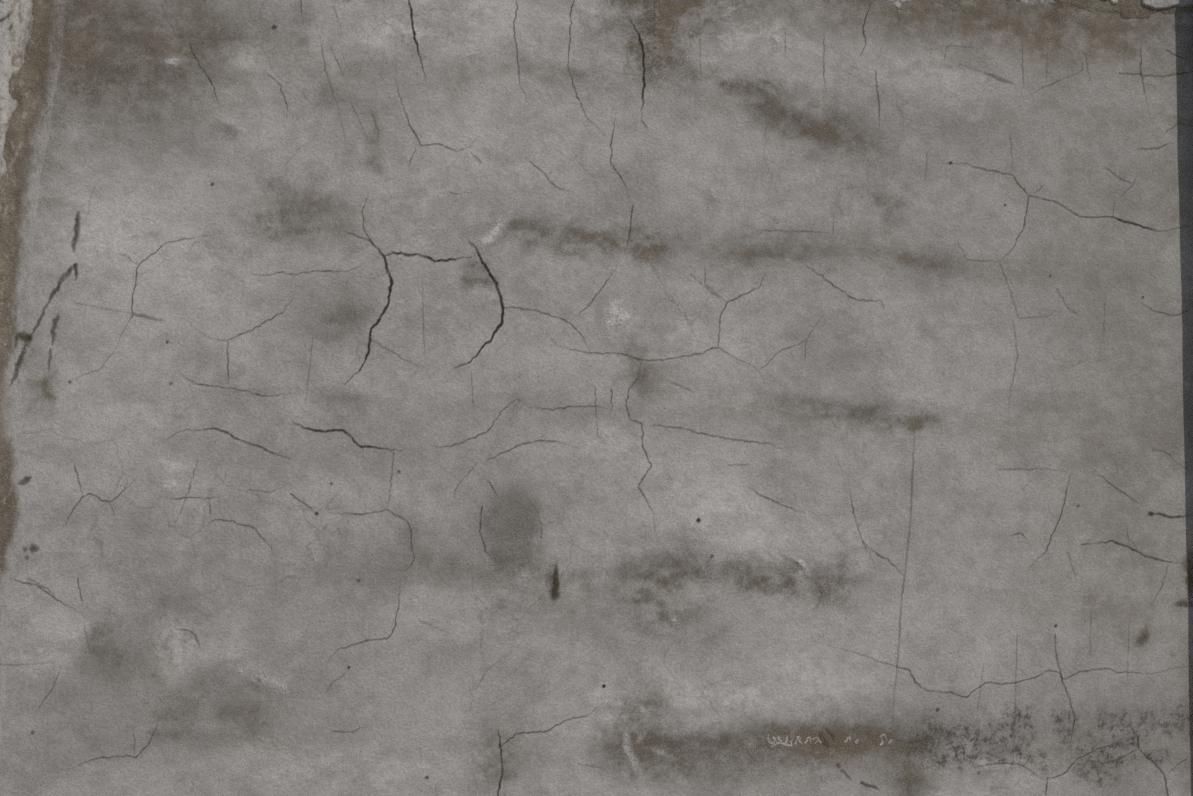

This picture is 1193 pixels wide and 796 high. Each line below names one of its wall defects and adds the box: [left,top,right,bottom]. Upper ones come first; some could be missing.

crack [409,1,425,73]
crack [631,21,646,107]
flaking render [1141,0,1193,10]
spalling [0,0,78,379]
crack [979,167,1149,235]
crack [347,235,731,382]
crack [208,427,273,453]
crack [299,424,393,450]
spalling [0,441,30,573]
crack [498,716,582,795]
leakage [607,700,1045,777]
leakage [1052,705,1187,783]